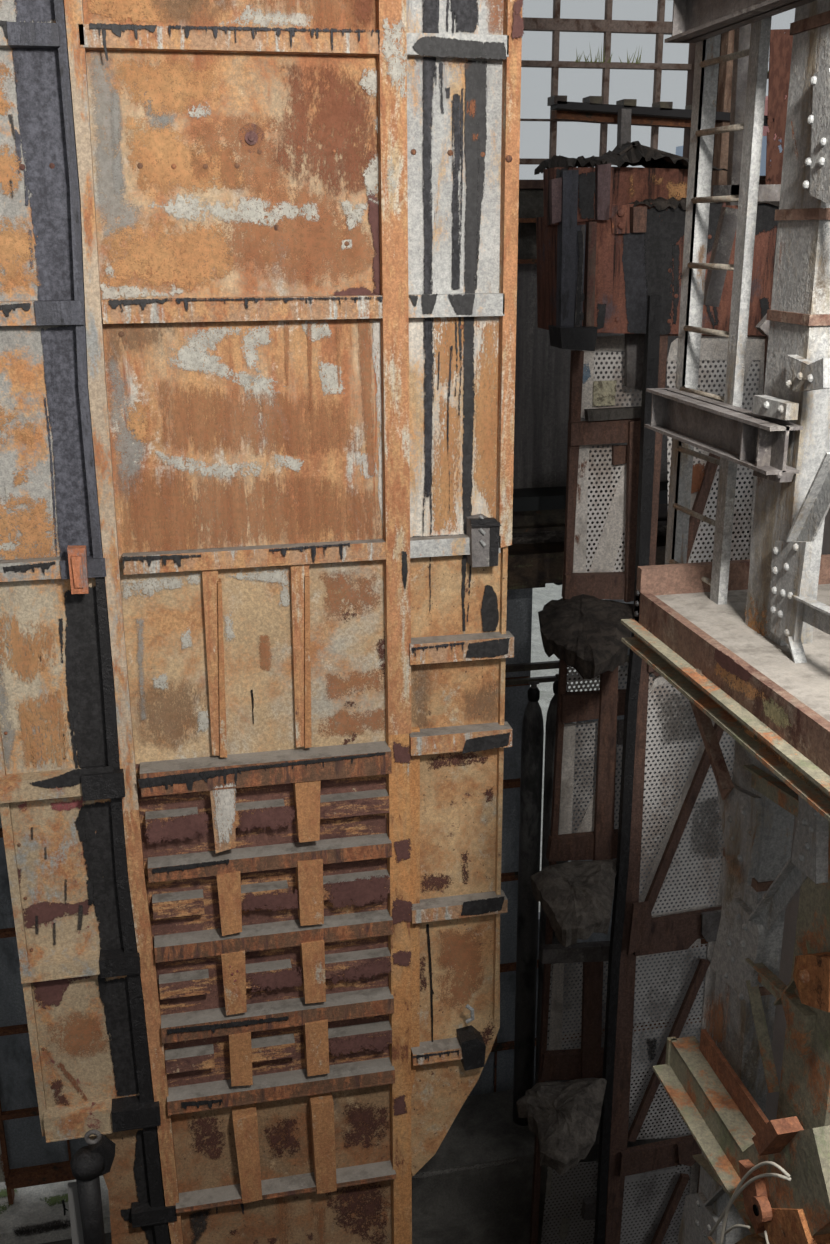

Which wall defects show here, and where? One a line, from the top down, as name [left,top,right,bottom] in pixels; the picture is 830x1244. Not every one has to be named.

rust [88,0,169,24]
rust [255,0,409,98]
rust [101,59,396,292]
peeling [302,321,332,341]
peeling [167,325,286,406]
rust [126,319,375,476]
peeling [318,360,345,394]
rust [121,471,379,552]
rust [319,573,380,622]
rust [259,635,272,671]
rust [319,668,386,736]
rust [714,648,765,700]